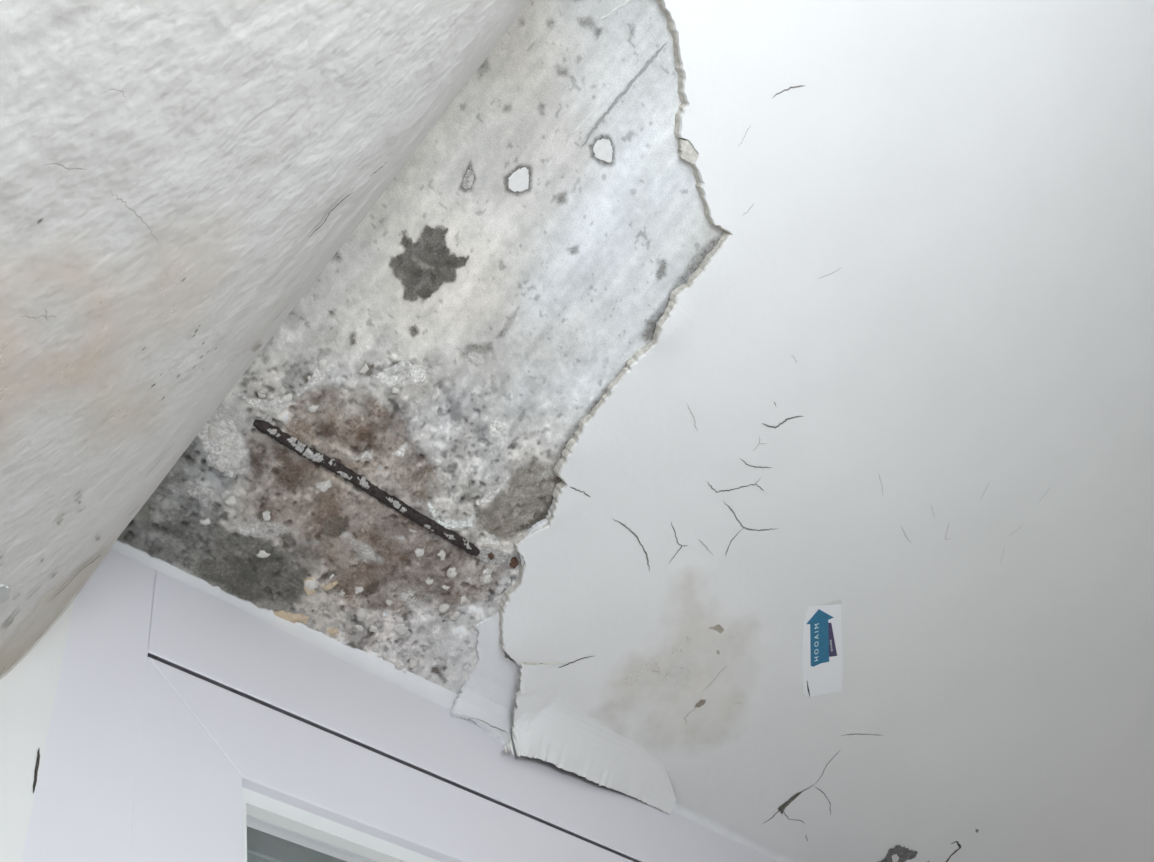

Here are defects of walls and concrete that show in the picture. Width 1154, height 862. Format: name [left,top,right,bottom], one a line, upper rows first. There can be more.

leakage [198,362,335,477]
rust [287,390,400,450]
leakage [376,360,426,387]
spalling [117,0,725,694]
leakage [160,476,301,603]
rust [300,490,495,613]
crack [613,402,804,571]
crack [763,734,880,841]
peeling [880,845,918,862]